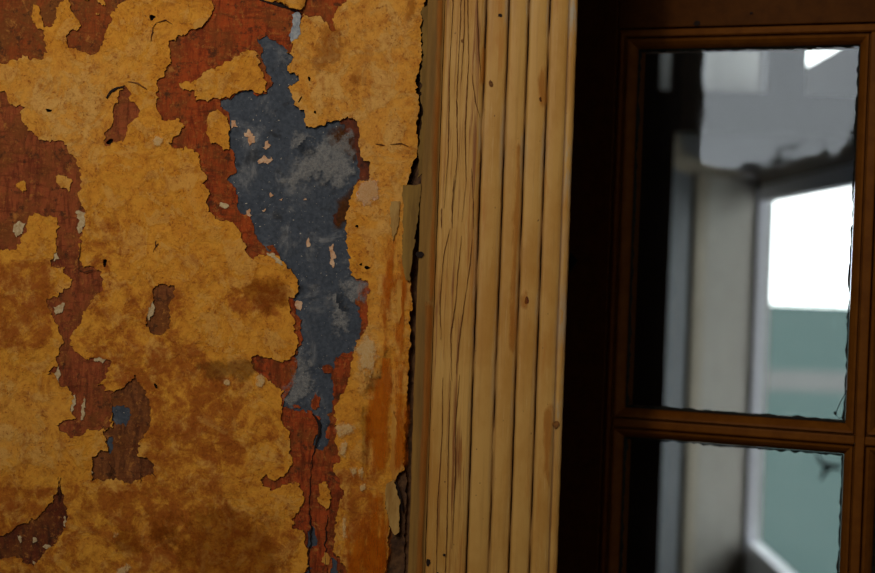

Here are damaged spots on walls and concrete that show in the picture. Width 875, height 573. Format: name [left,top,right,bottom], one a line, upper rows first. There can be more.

peeling [0,0,126,64]
peeling [104,81,146,146]
peeling [0,91,158,484]
peeling [146,283,175,335]
flaking render [153,0,379,573]
rust [383,257,406,352]
peeling [390,184,421,322]
rust [366,358,407,470]
peeling [0,487,68,565]
flaking render [385,411,407,573]